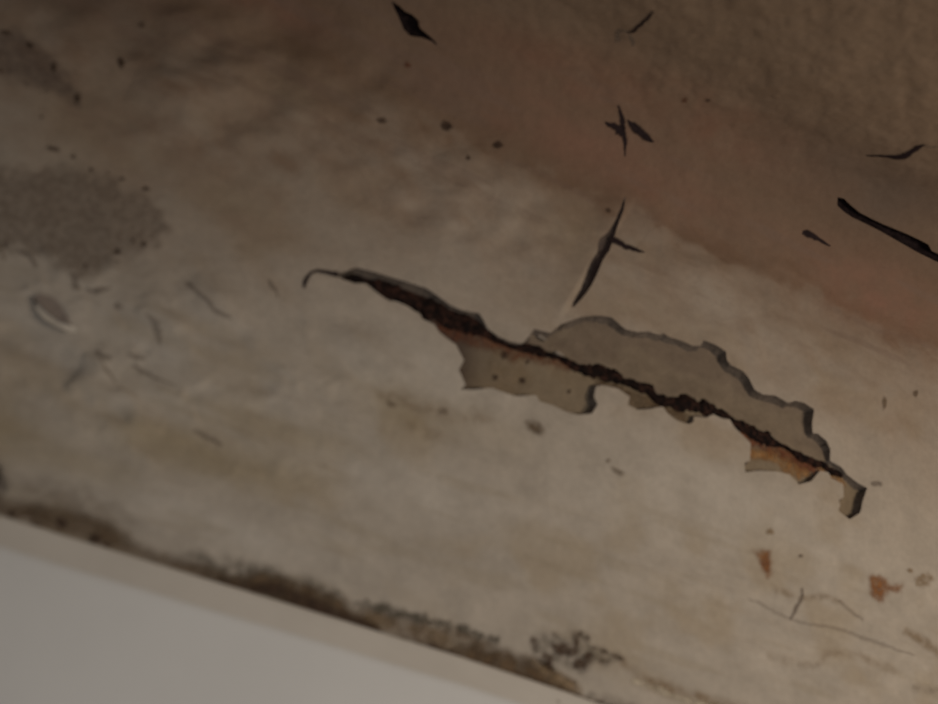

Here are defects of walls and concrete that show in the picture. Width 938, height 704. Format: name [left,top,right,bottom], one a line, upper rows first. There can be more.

crack [392,2,439,47]
crack [617,11,654,45]
crack [605,105,654,156]
crack [866,144,934,160]
crack [572,197,645,308]
crack [802,230,831,246]
crack [837,197,938,262]
flaking render [303,268,867,519]
corrosion [759,551,770,574]
water stain [0,484,623,704]
corrosion [871,576,899,600]